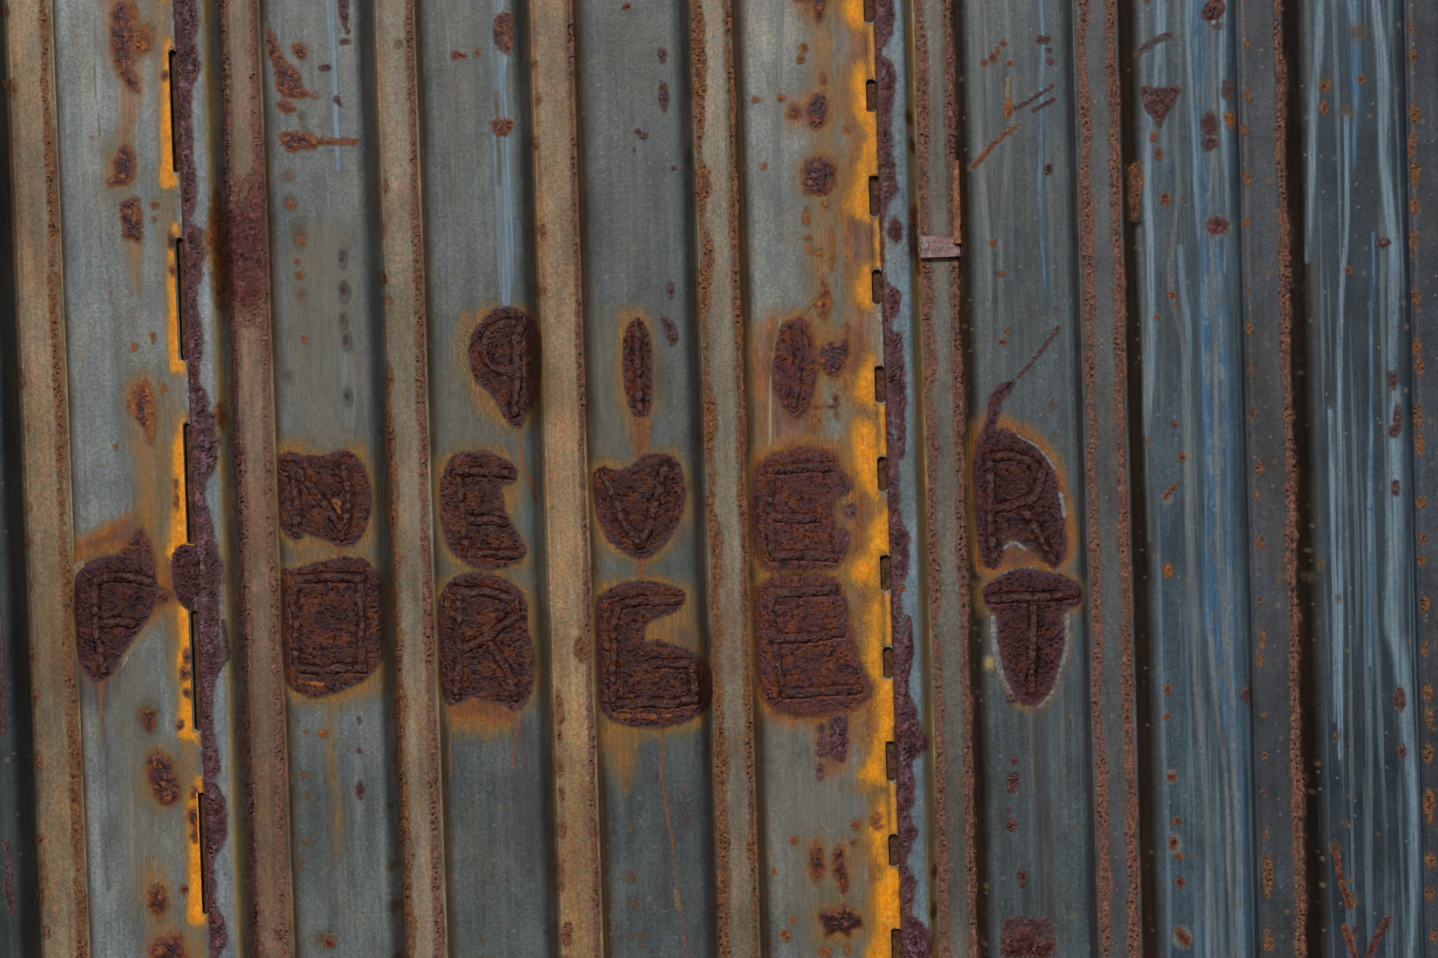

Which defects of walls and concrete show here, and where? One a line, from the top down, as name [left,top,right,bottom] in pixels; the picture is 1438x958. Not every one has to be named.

rust [39,0,544,958]
rust [553,691,565,802]
rust [1174,928,1190,947]